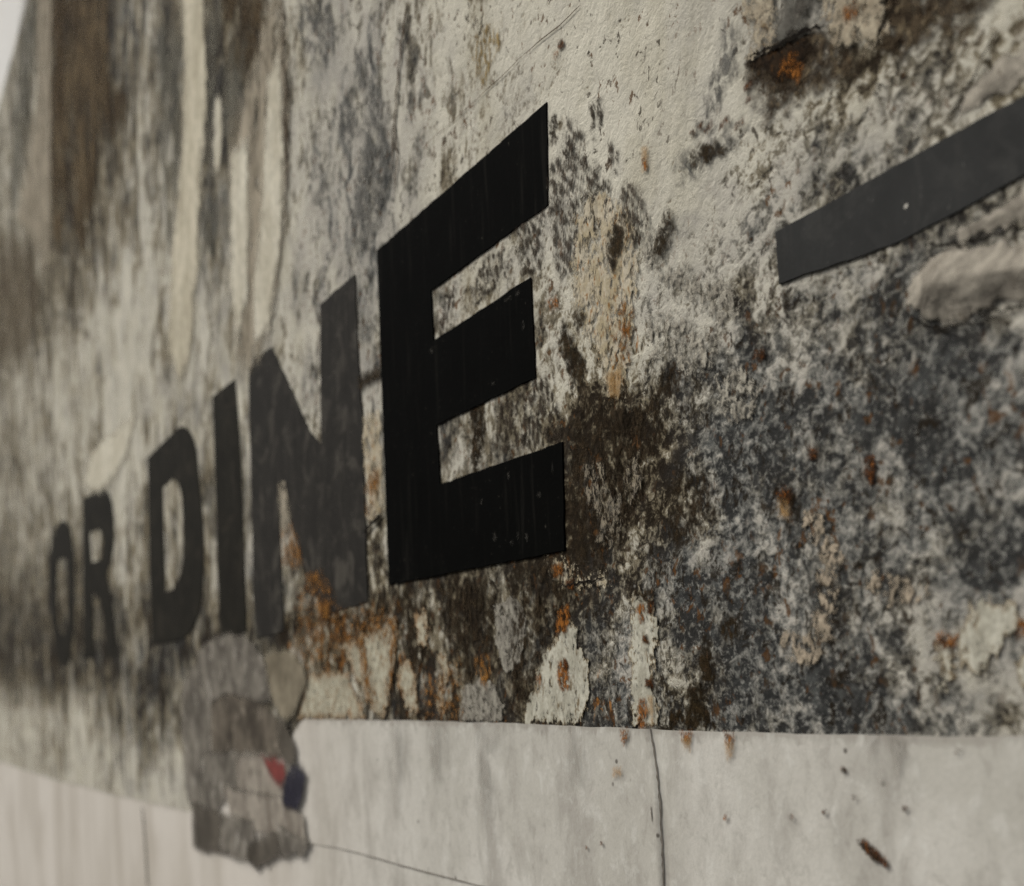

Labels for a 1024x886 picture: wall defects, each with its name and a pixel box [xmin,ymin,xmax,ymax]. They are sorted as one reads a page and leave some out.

damp [10,0,37,225]
damp [50,0,129,251]
damp [158,22,179,245]
damp [208,0,269,133]
rust [689,115,744,136]
damp [557,320,588,385]
rust [278,481,386,671]
damp [470,361,688,564]
damp [670,472,716,547]
damp [662,649,716,731]
crack [649,725,664,886]
rust [857,838,889,868]